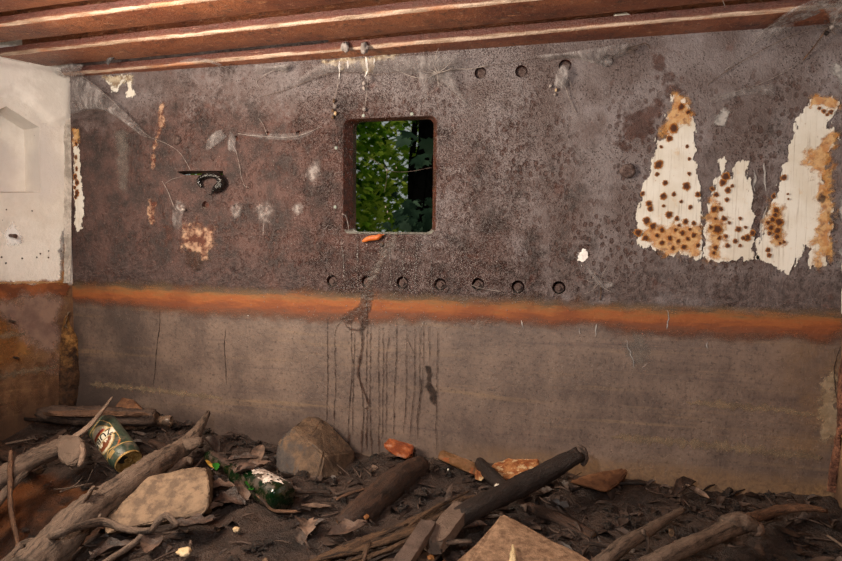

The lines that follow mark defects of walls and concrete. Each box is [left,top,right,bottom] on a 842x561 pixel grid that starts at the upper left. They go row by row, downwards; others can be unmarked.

peeling [102,74,136,98]
rust [151,104,165,168]
peeling [36,129,84,278]
rust [147,199,157,224]
peeling [633,92,841,275]
rust [180,223,213,270]
rust [0,280,842,342]
damp [326,237,438,454]